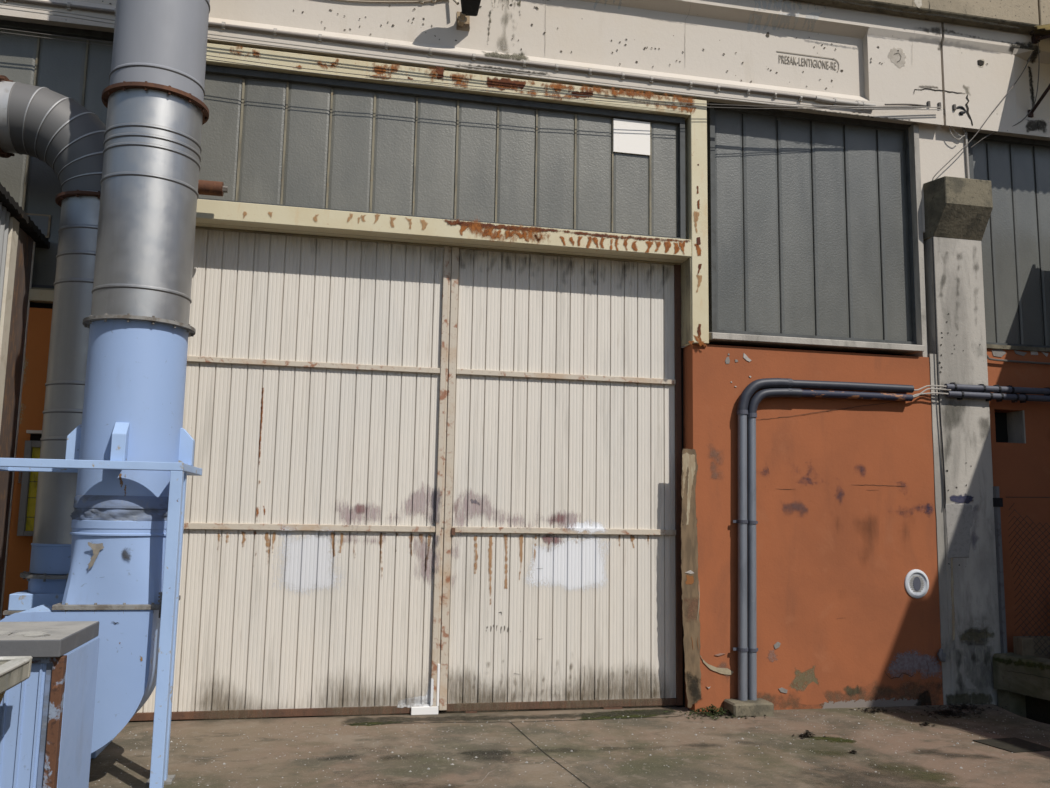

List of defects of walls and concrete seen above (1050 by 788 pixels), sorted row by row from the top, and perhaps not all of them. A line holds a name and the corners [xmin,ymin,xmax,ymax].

rust [369,62,695,112]
rust [347,214,427,230]
rust [445,186,702,292]
rust [689,324,706,346]
rust [242,532,276,554]
rust [397,533,431,569]
rust [474,535,549,604]
flaking render [681,449,710,708]
flaking render [779,666,818,693]